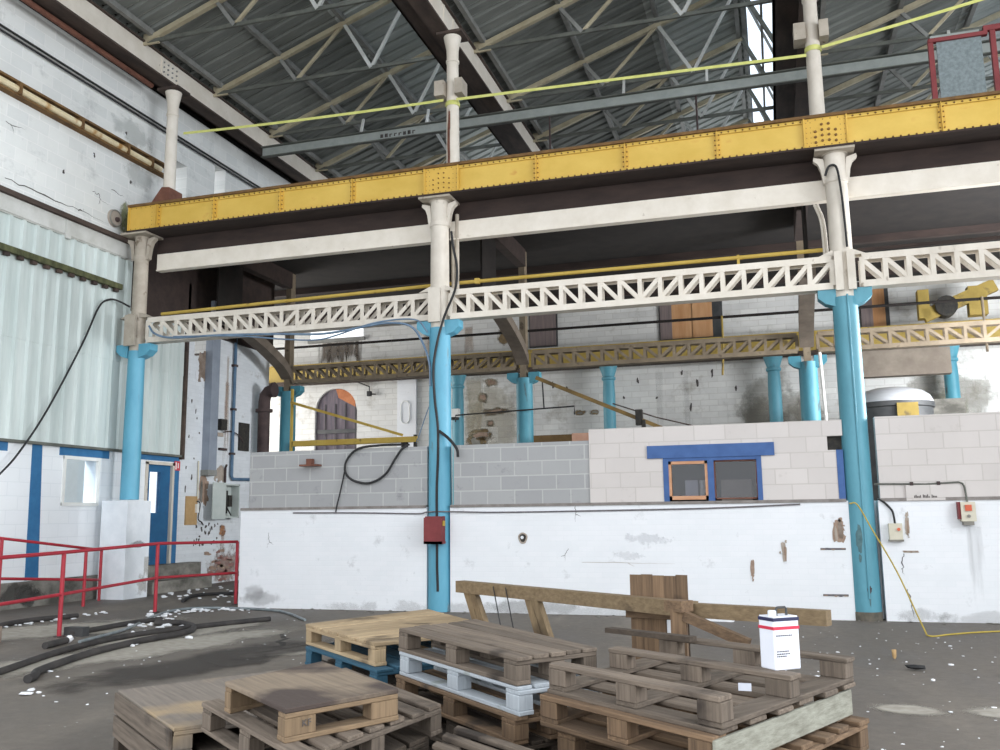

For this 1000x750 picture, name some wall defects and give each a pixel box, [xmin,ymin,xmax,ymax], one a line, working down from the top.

crack [6,178,123,220]
peeling [195,351,206,382]
flaking render [466,378,508,445]
spalling [193,523,240,581]
peeling [779,540,787,564]
peeling [822,517,863,562]